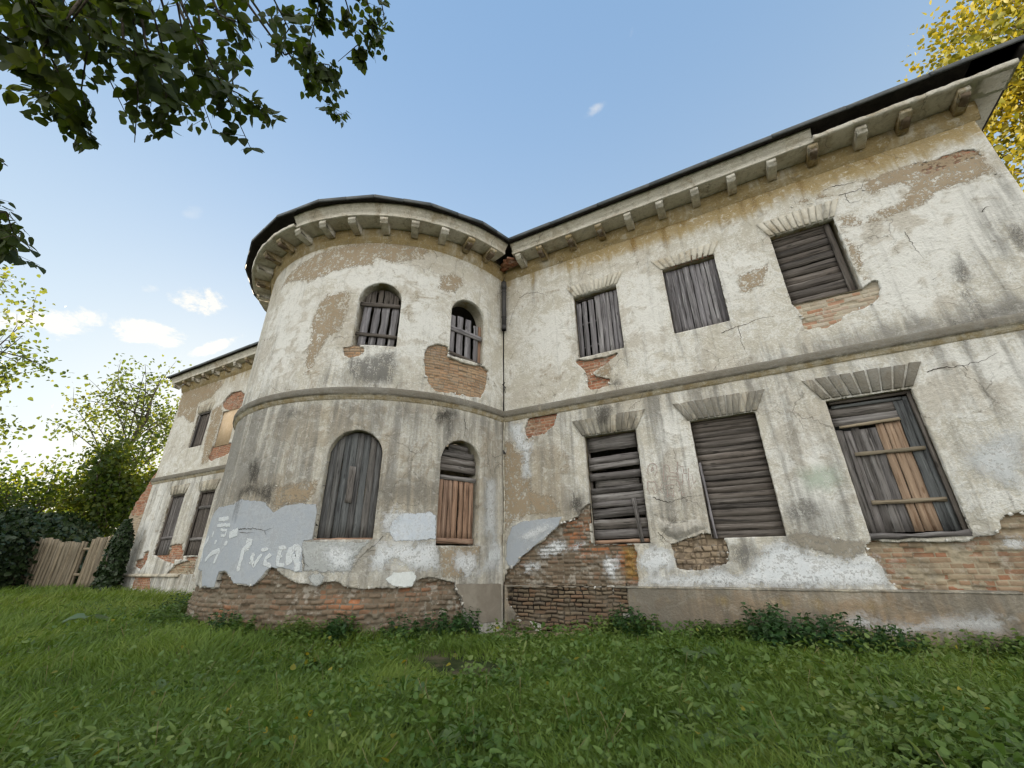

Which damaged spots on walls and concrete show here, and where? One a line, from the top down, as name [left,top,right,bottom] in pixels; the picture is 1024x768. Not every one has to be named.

peeling [794,150,997,330]
flaking render [423,345,489,398]
flaking render [576,354,617,390]
peeling [178,382,245,463]
flaking render [131,413,652,638]
flaking render [671,531,729,572]
flaking render [788,511,1024,593]